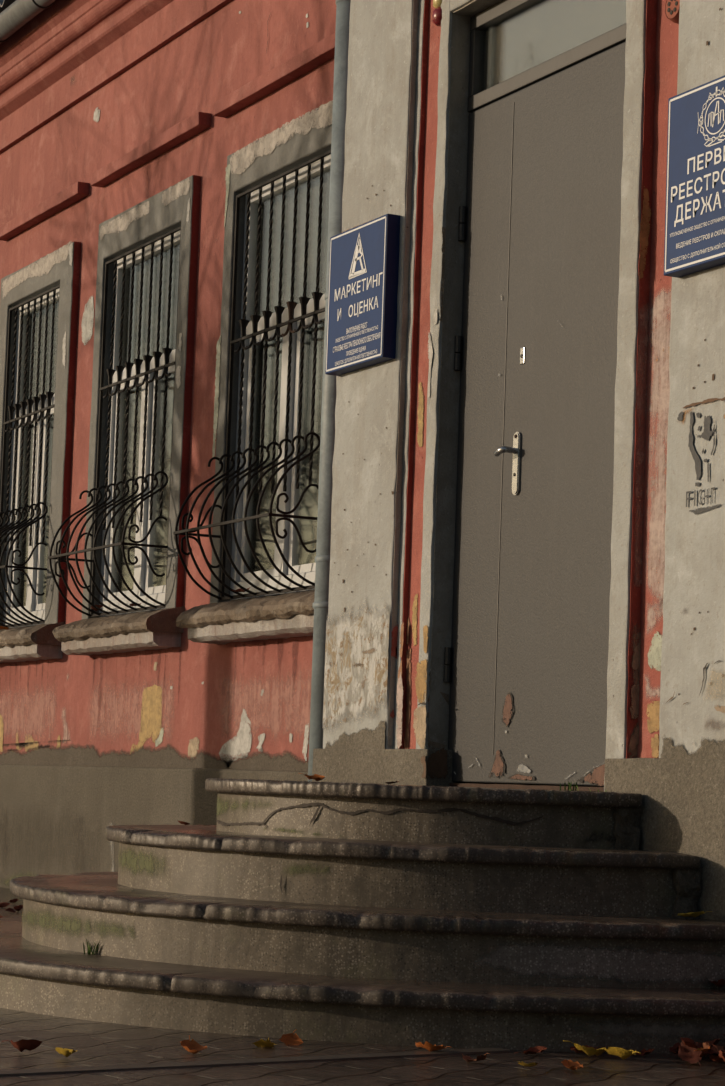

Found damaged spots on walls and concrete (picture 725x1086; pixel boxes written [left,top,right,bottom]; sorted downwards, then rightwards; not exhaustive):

peeling [2,241,73,297]
peeling [99,178,190,240]
peeling [224,100,333,227]
peeling [212,335,221,457]
peeling [417,227,446,447]
flaking render [0,685,309,771]
peeling [323,594,448,778]
flaking render [629,627,725,760]
crack [215,802,542,828]